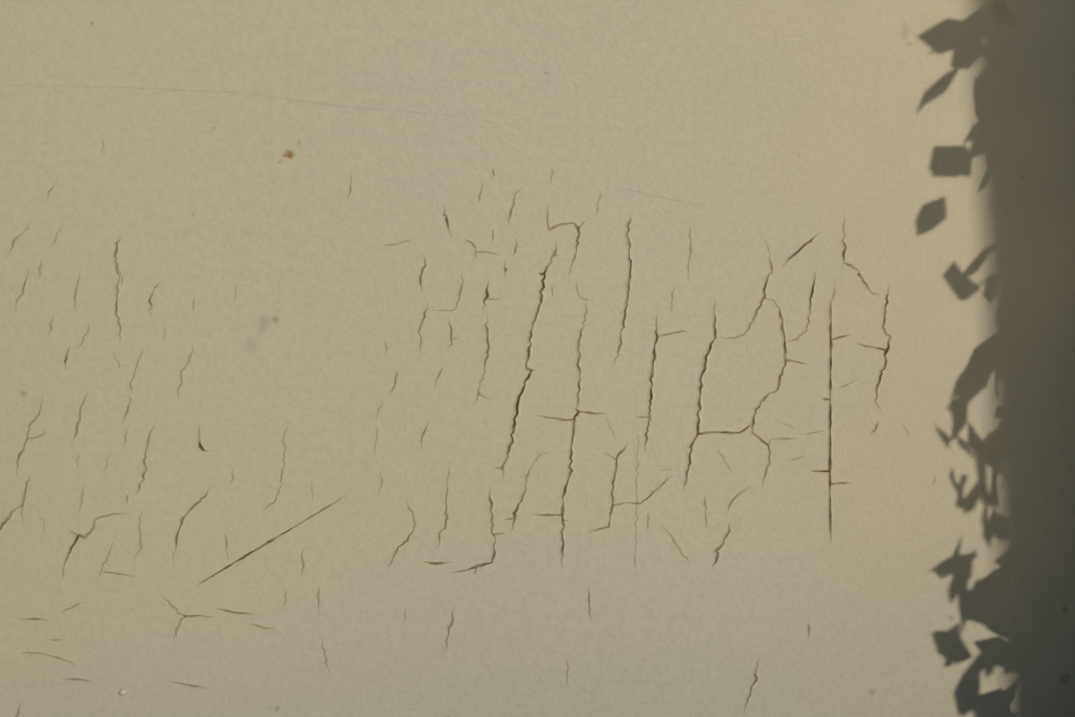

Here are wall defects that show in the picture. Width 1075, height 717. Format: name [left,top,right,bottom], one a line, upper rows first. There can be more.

crack [441,213,450,229]
crack [111,242,122,331]
crack [417,264,427,284]
crack [428,221,597,570]
crack [609,220,891,564]
crack [137,438,151,489]
crack [0,453,29,535]
crack [173,494,207,545]
crack [62,534,83,566]
crack [391,536,409,561]